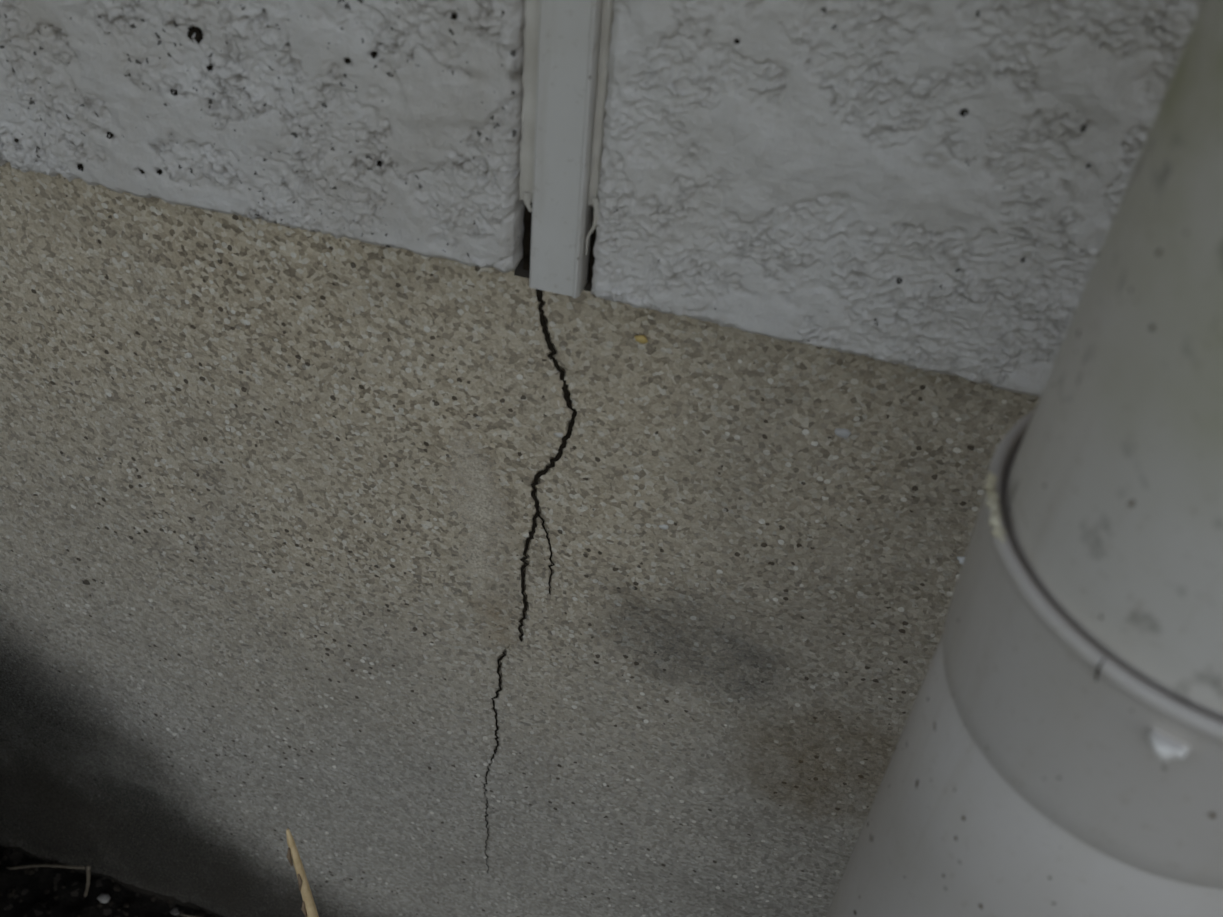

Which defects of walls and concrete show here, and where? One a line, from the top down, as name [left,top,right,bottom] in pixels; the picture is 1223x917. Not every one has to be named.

crack [484,289,577,873]